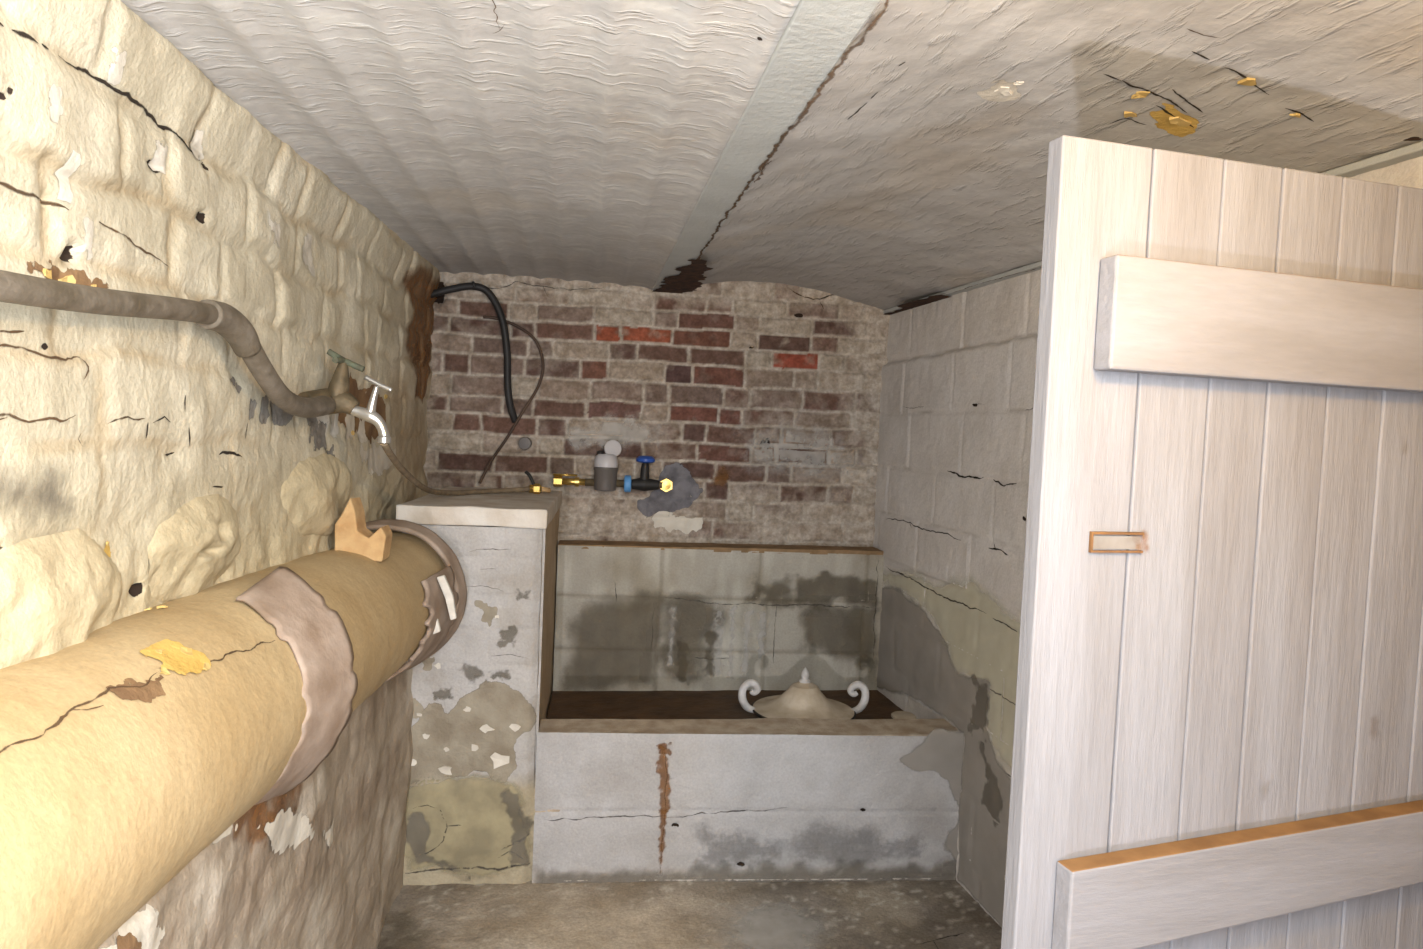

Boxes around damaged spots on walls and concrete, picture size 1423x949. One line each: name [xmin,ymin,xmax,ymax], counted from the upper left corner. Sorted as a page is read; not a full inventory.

crack [0,22,193,153]
peeling [1124,91,1199,137]
peeling [1237,77,1257,86]
crack [0,395,248,488]
peeling [474,600,499,627]
leakage [565,597,720,690]
peeling [410,681,537,787]
leakage [751,571,1020,928]
rust [656,742,672,863]